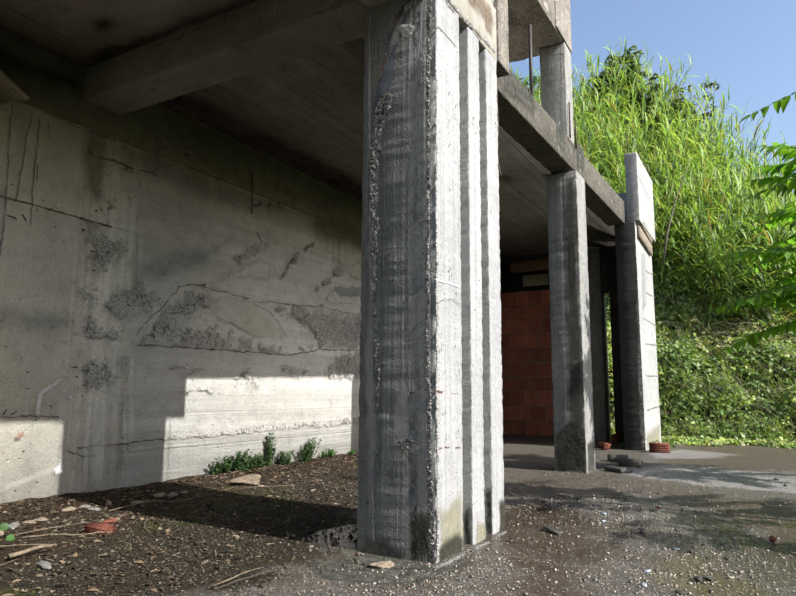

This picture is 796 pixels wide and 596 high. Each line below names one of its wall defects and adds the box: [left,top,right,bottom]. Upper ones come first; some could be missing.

damp [0,105,49,254]
crack [0,195,112,228]
crack [137,7,409,412]
crack [0,412,60,420]
crack [67,417,359,457]